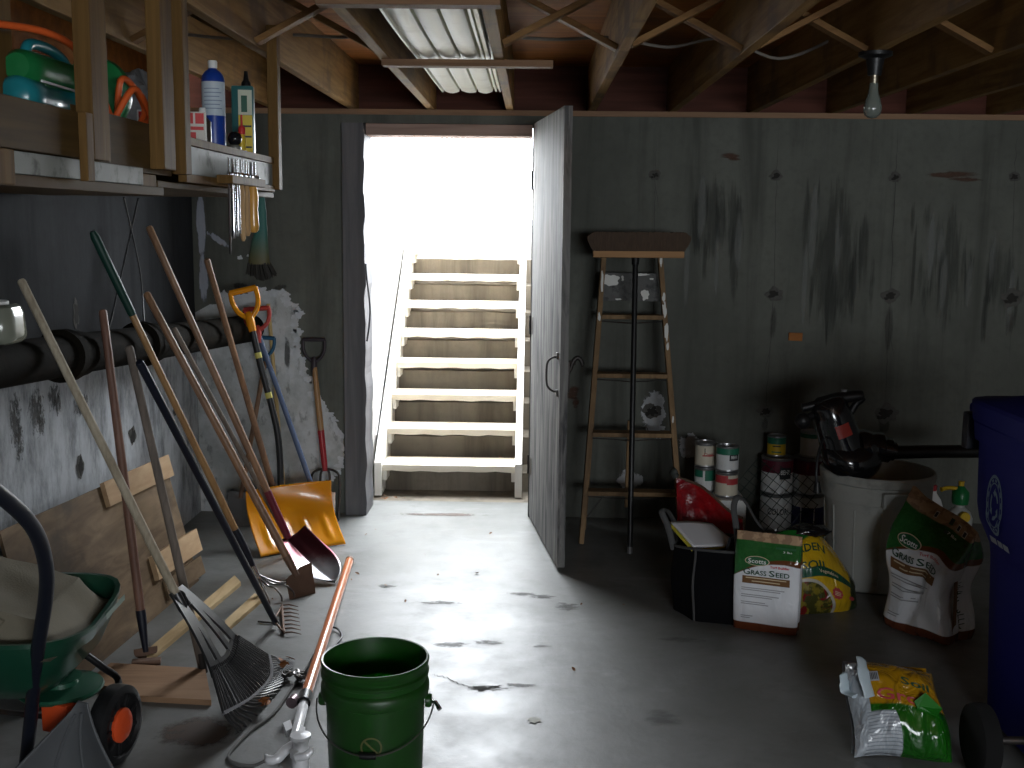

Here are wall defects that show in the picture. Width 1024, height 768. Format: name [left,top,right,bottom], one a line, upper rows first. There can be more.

leakage [10,384,61,460]
peeling [195,287,345,511]